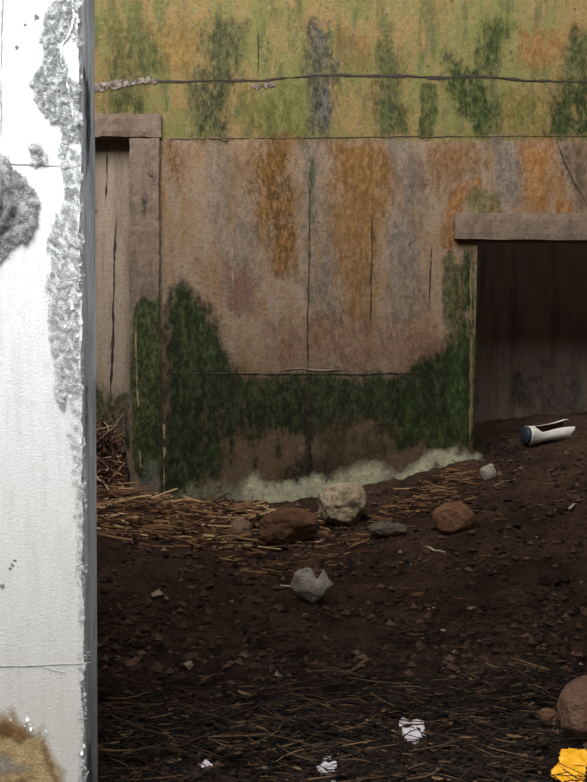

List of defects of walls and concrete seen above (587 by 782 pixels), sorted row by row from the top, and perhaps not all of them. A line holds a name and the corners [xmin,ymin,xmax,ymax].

spalling [0,153,41,262]
corrosion [248,132,298,277]
water stain [301,19,337,232]
corrosion [310,138,396,367]
corrosion [429,143,487,251]
peeling [28,0,90,782]
water stain [181,341,482,503]
crack [0,662,90,672]